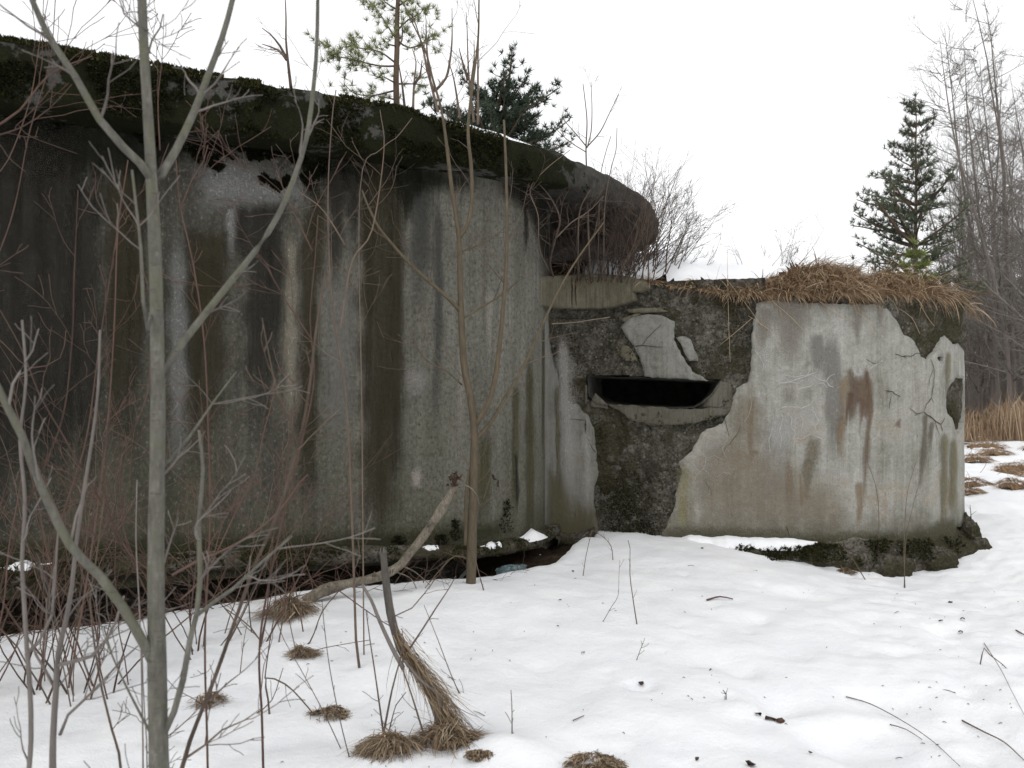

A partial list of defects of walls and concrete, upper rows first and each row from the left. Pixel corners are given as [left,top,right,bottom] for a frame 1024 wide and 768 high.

water stain [503,184,549,261]
water stain [171,155,470,522]
water stain [478,442,489,506]
water stain [513,336,593,542]
spalling [541,274,766,536]
water stain [669,416,958,544]
rust [837,371,873,520]
crack [870,353,945,437]
spalling [946,376,964,429]
water stain [0,540,148,562]
water stain [165,531,464,553]
spalling [743,512,993,577]